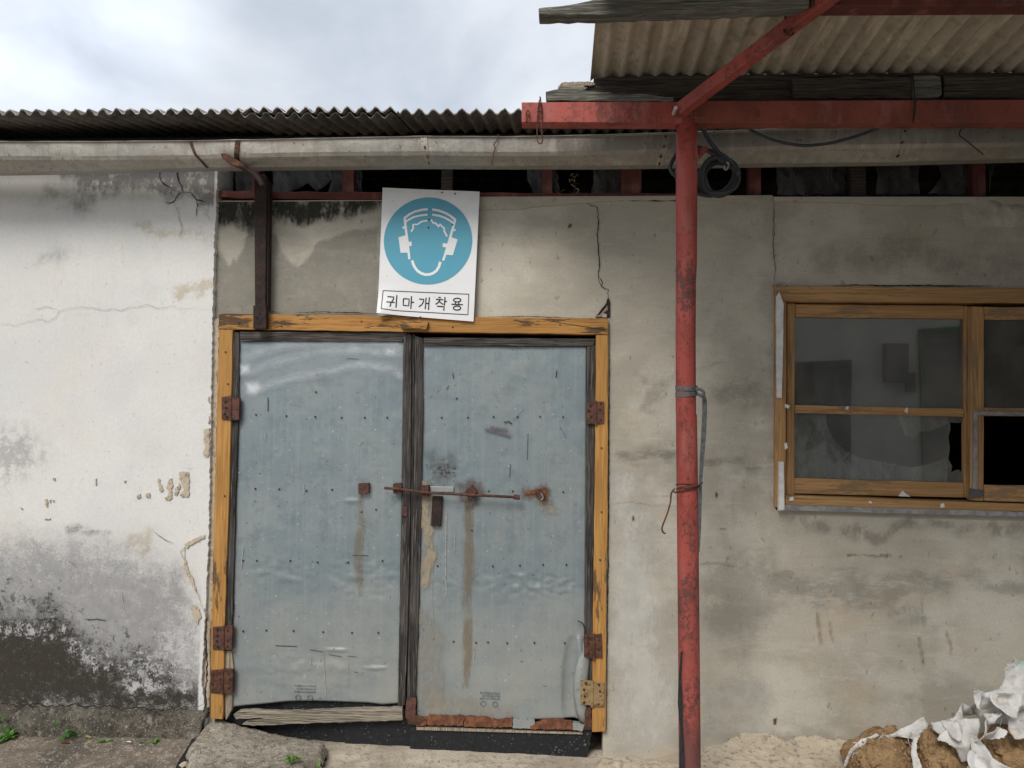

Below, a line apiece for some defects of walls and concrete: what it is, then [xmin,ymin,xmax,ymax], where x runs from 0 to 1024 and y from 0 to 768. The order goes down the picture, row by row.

crack [138,172,209,232]
damp [218,202,255,230]
damp [272,201,381,225]
crack [587,203,609,294]
peeling [137,471,190,500]
flaking render [184,318,220,712]
damp [0,547,198,710]